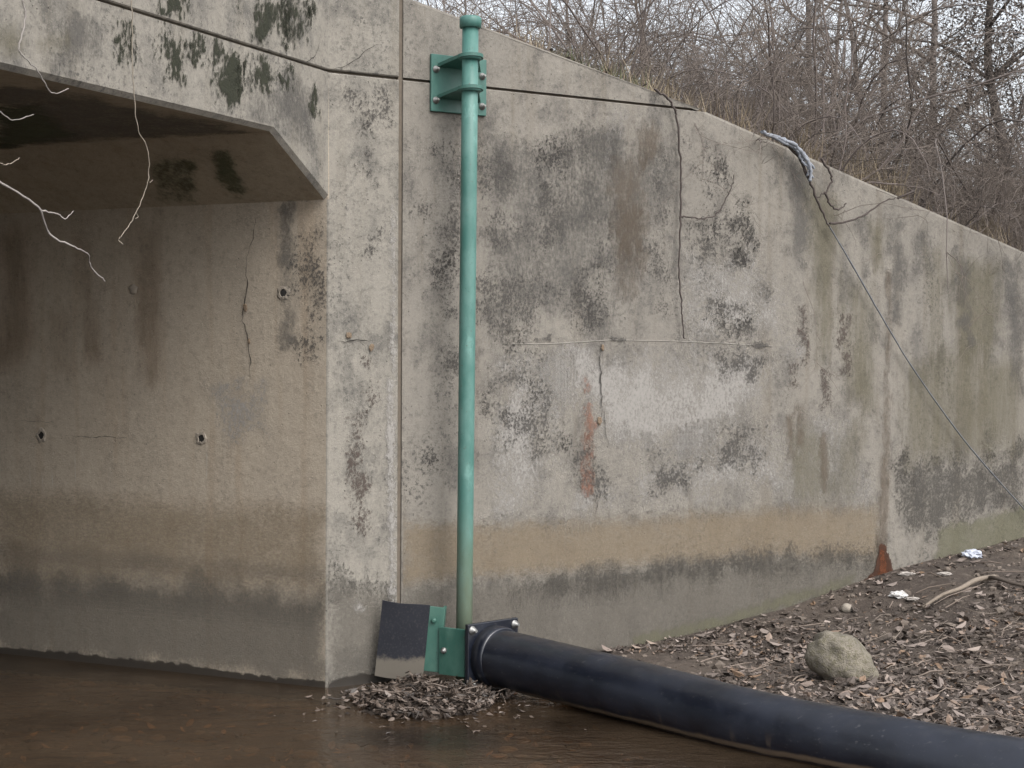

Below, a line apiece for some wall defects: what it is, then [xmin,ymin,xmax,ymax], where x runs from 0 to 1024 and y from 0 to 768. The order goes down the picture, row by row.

leakage [113,18,138,68]
leakage [153,0,207,87]
crack [242,218,256,382]
leakage [409,200,460,377]
crack [597,345,608,440]
leakage [472,129,893,651]
leakage [0,297,457,705]